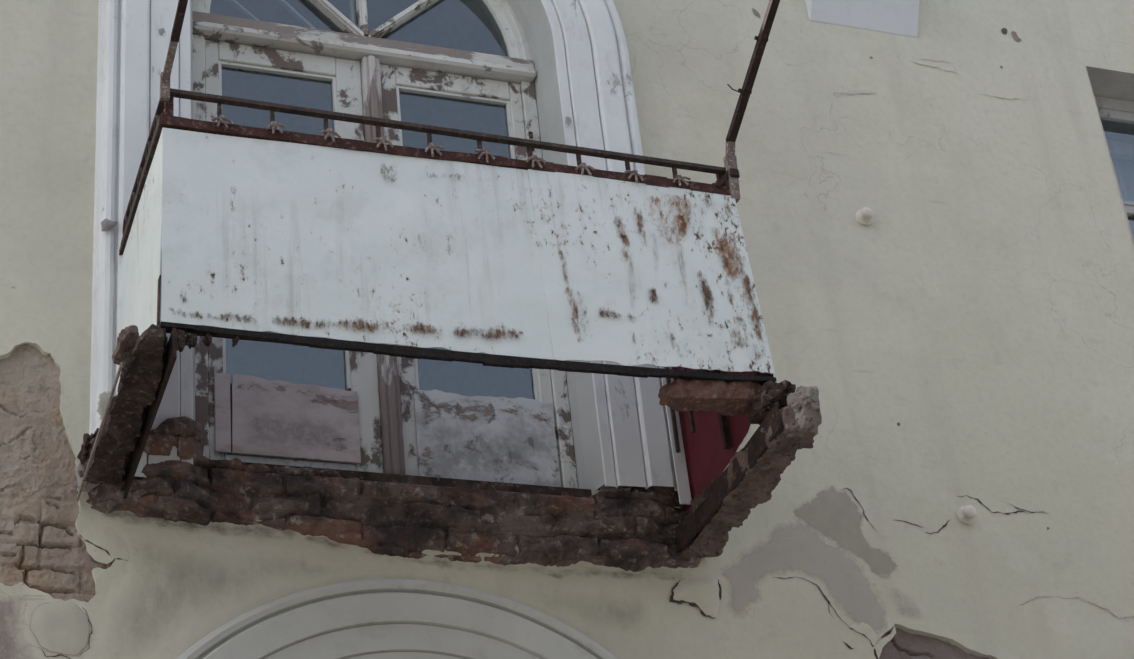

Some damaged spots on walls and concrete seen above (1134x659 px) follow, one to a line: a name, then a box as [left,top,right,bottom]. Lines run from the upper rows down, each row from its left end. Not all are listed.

corrosion [615,196,691,267]
corrosion [698,273,714,319]
corrosion [716,228,763,359]
corrosion [276,317,379,331]
corrosion [406,322,437,333]
corrosion [454,326,523,339]
peeling [424,399,545,421]
flaking render [0,344,114,602]
peeling [795,488,896,574]
crack [841,488,1044,534]
crack [1019,596,1134,619]
flaking render [874,626,989,659]